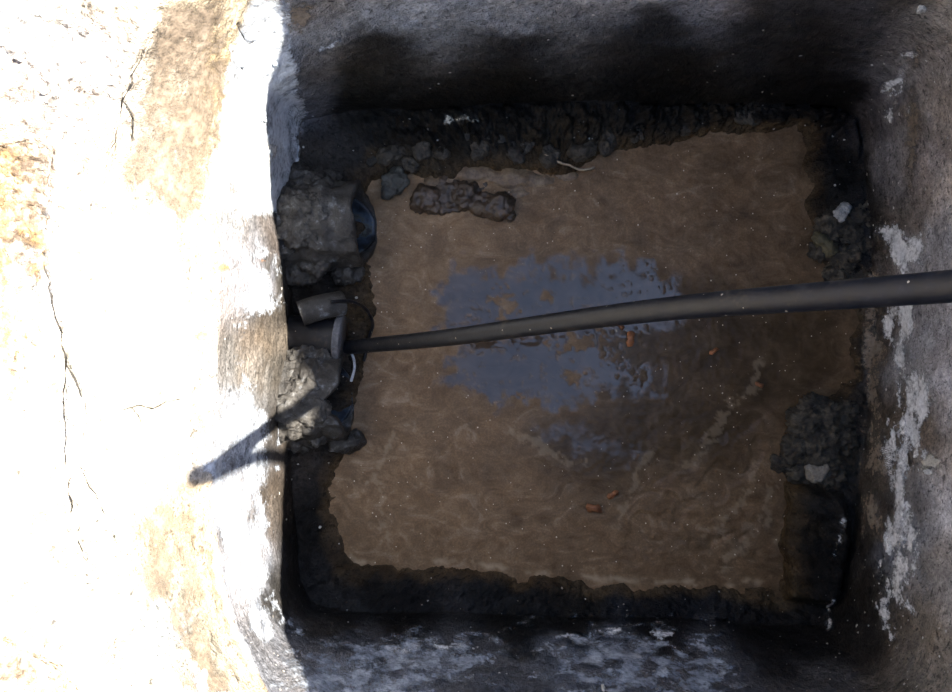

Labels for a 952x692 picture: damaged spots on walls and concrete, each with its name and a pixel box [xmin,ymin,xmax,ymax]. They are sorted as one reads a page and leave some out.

water stain [275,0,314,34]
crack [108,35,154,156]
water stain [881,47,923,190]
water stain [235,248,282,325]
water stain [875,225,924,274]
crack [42,253,117,578]
water stain [202,375,302,641]
water stain [861,305,929,641]
water stain [134,501,228,692]
water stain [287,628,500,692]
water stain [528,624,742,692]